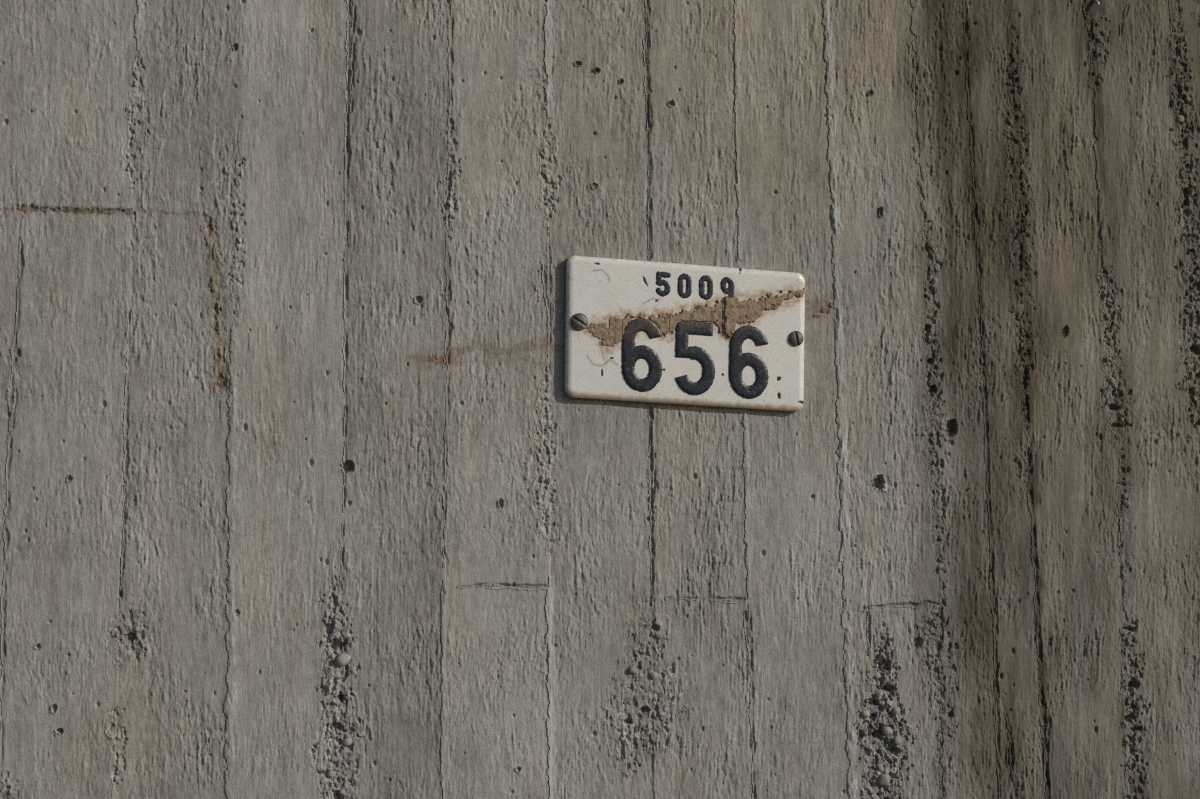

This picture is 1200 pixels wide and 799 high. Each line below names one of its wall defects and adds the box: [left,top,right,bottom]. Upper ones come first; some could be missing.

leakage [880,0,1200,799]